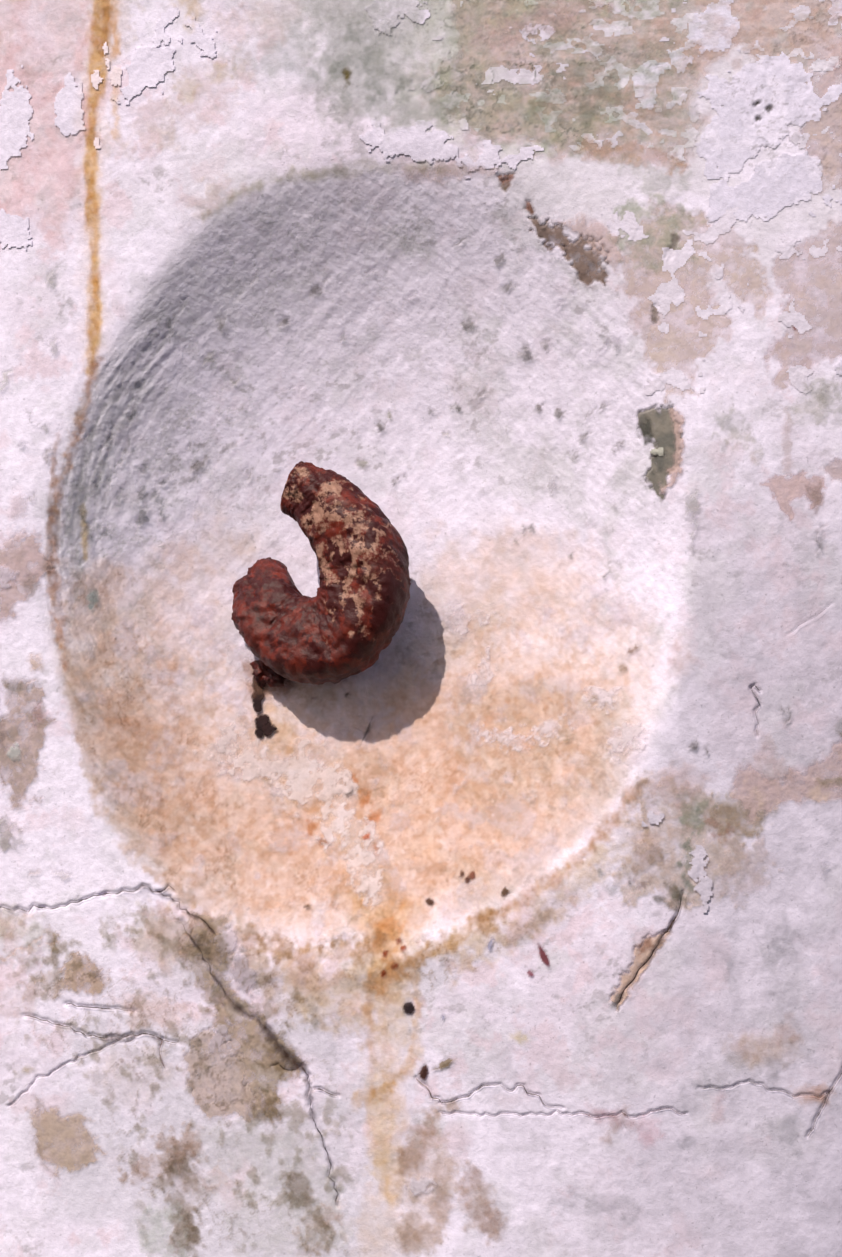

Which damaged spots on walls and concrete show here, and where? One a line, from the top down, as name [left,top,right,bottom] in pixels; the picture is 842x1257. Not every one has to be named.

corrosion [91,42,122,89]
peeling [0,65,34,169]
peeling [54,72,86,136]
peeling [359,0,842,338]
peeling [0,208,32,250]
peeling [780,364,826,395]
spalling [638,358,705,499]
corrosion [251,677,277,738]
crack [0,884,338,1201]
crack [416,1078,685,1118]
crack [703,1074,842,1136]